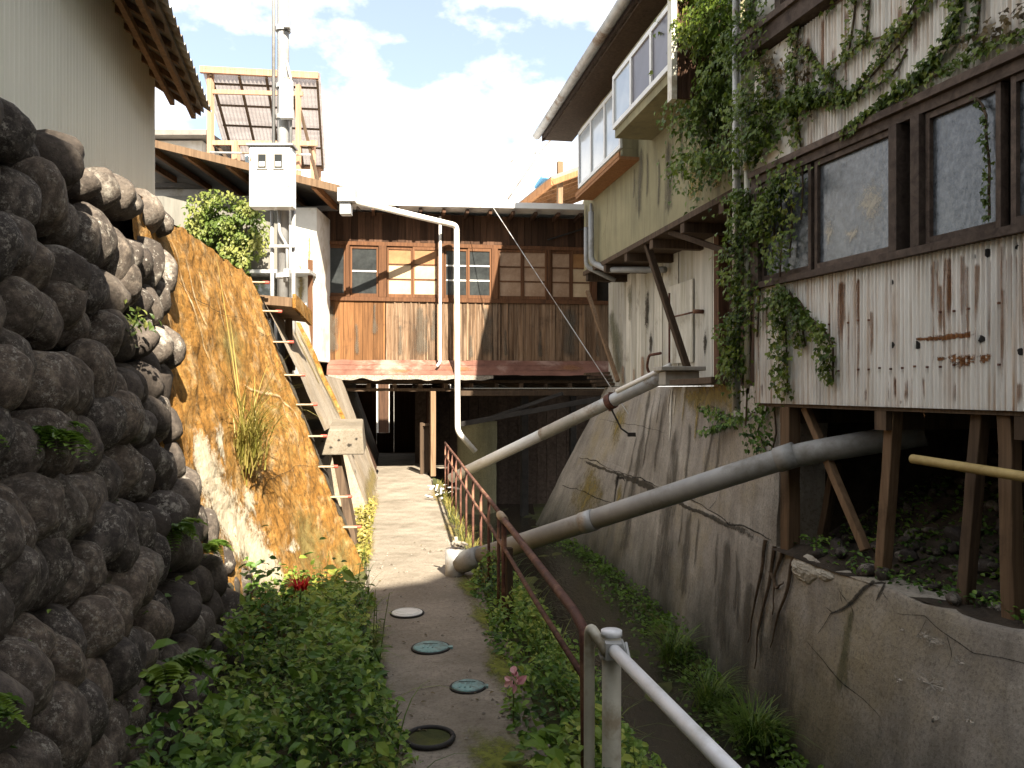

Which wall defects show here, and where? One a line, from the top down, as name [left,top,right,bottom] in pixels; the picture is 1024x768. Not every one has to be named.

rust [829,280,873,364]
rust [916,255,1023,371]
crack [562,439,657,509]
damp [586,388,699,499]
crack [692,500,769,539]
damp [655,502,786,725]